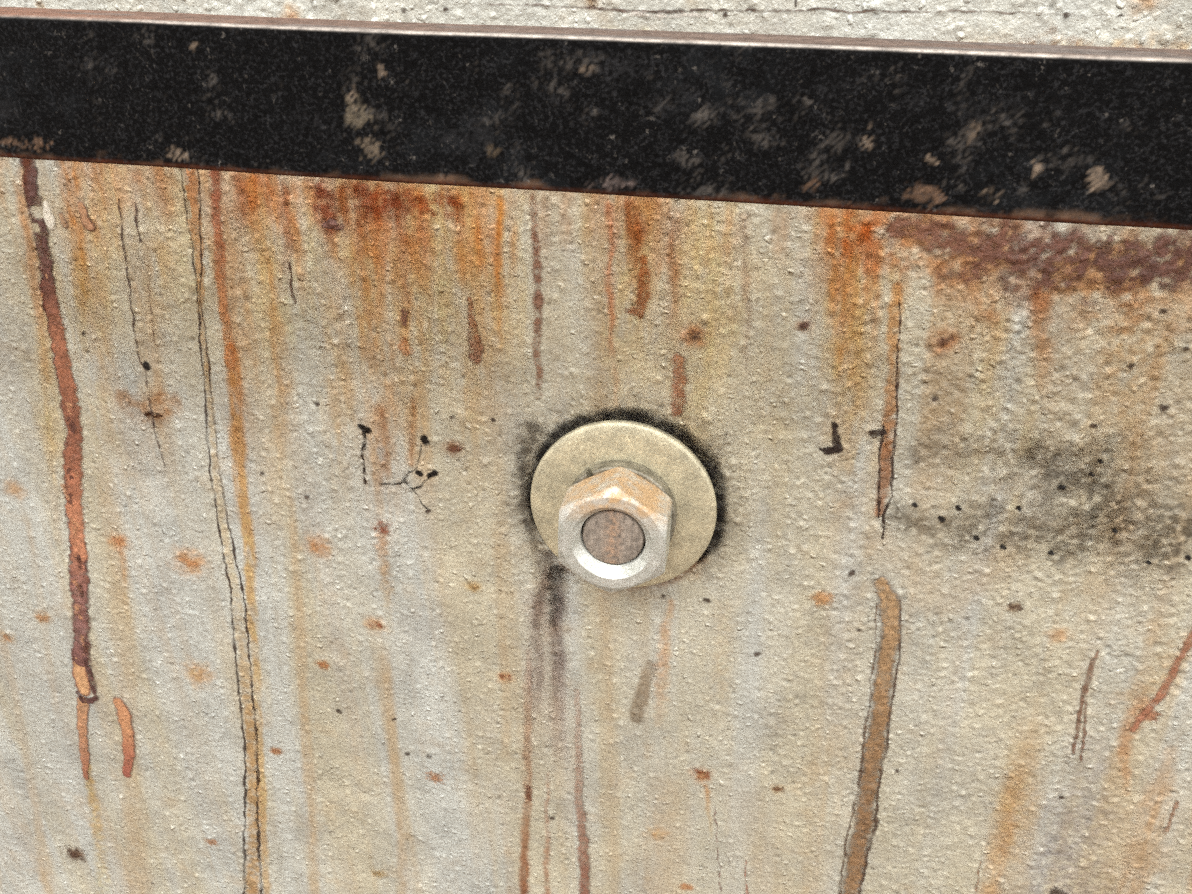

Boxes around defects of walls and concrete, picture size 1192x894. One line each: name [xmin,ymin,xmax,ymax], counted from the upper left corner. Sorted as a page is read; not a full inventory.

rust [182,169,234,426]
rust [467,297,483,364]
rust [532,213,543,379]
rust [628,255,650,318]
rust [886,217,1192,291]
rust [20,158,98,780]
rust [869,301,902,539]
rust [113,697,135,778]
rust [214,499,260,860]
rust [838,577,901,894]
rust [1130,632,1192,732]
rust [575,757,590,894]